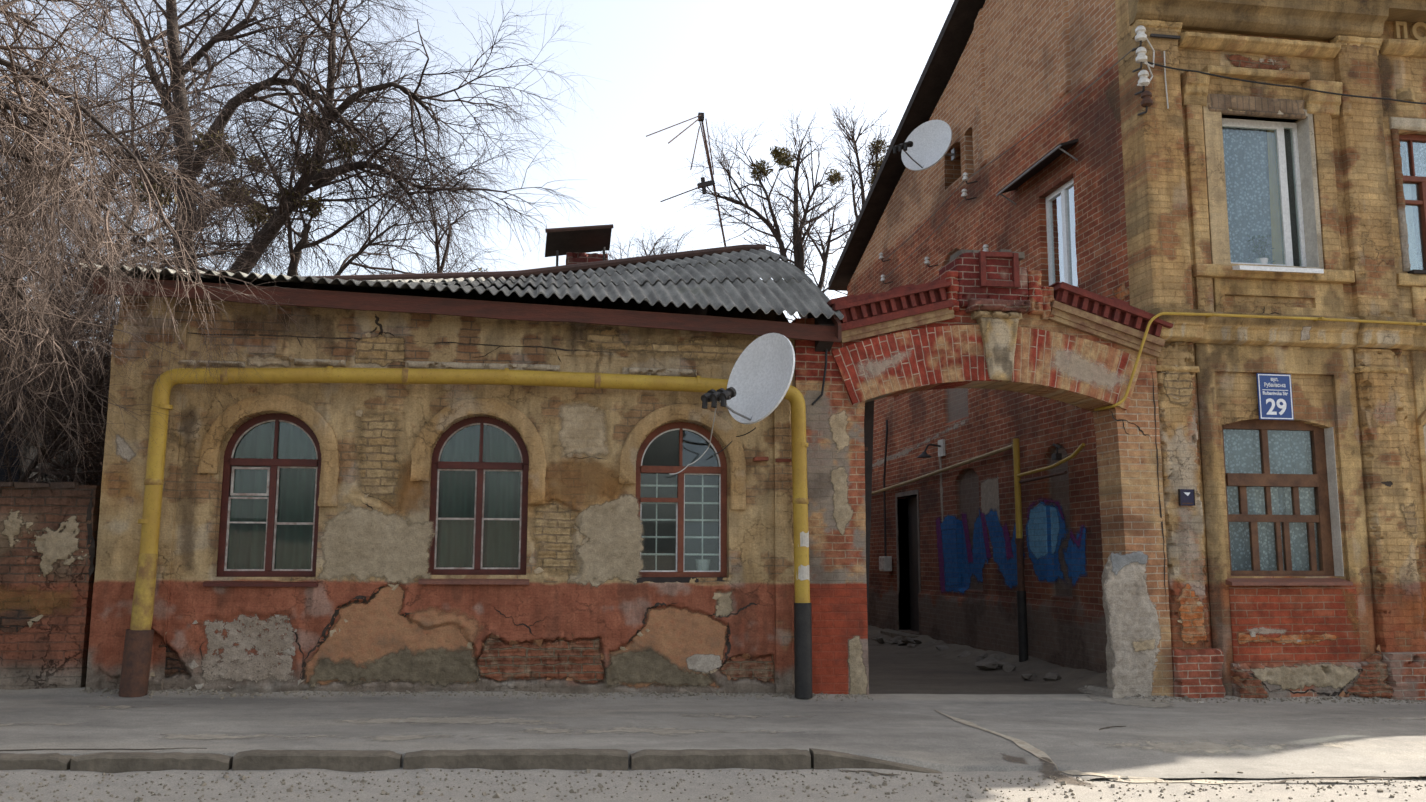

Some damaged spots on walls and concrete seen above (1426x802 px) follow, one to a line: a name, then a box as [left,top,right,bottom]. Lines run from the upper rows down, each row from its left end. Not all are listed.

spalling [1160,365,1193,406]
spalling [150,584,482,690]
crack [289,586,415,680]
spalling [611,593,775,688]
peeling [1101,552,1161,698]
spalling [1176,583,1207,645]
spalling [1232,667,1269,698]
spalling [1339,645,1393,699]